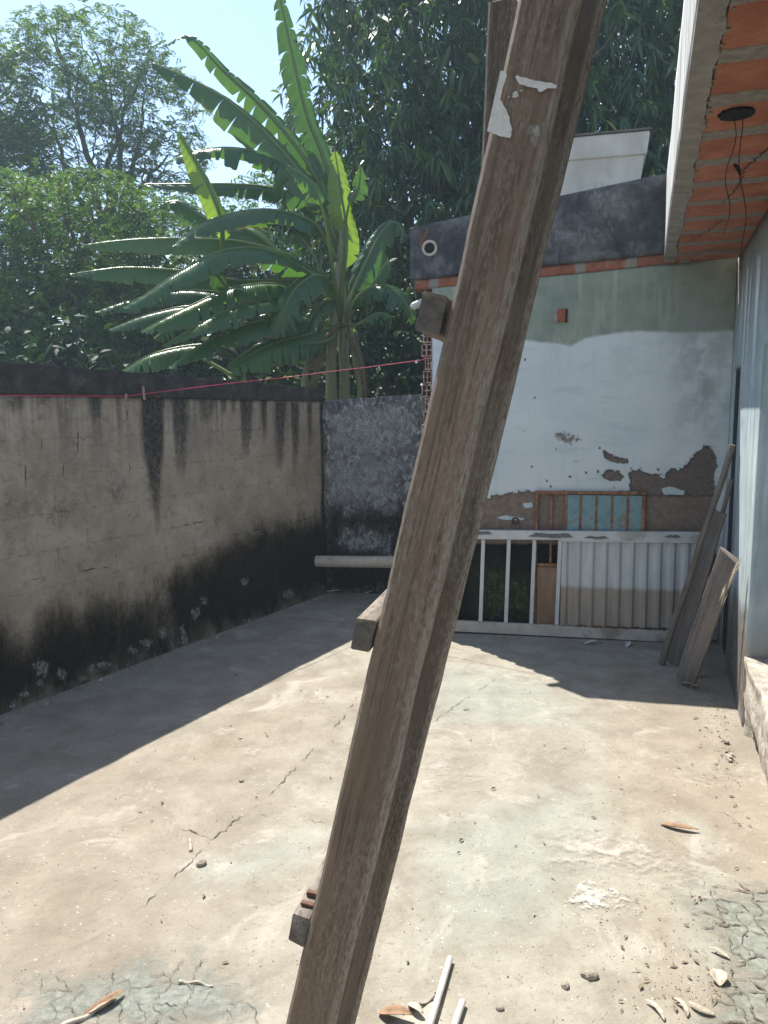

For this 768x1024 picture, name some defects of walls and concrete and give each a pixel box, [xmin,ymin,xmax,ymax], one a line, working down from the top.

water stain [0,398,412,715]
peeling [555,433,579,450]
peeling [476,444,718,545]
crack [118,698,356,922]
crack [10,959,258,1024]
crack [698,882,768,1024]